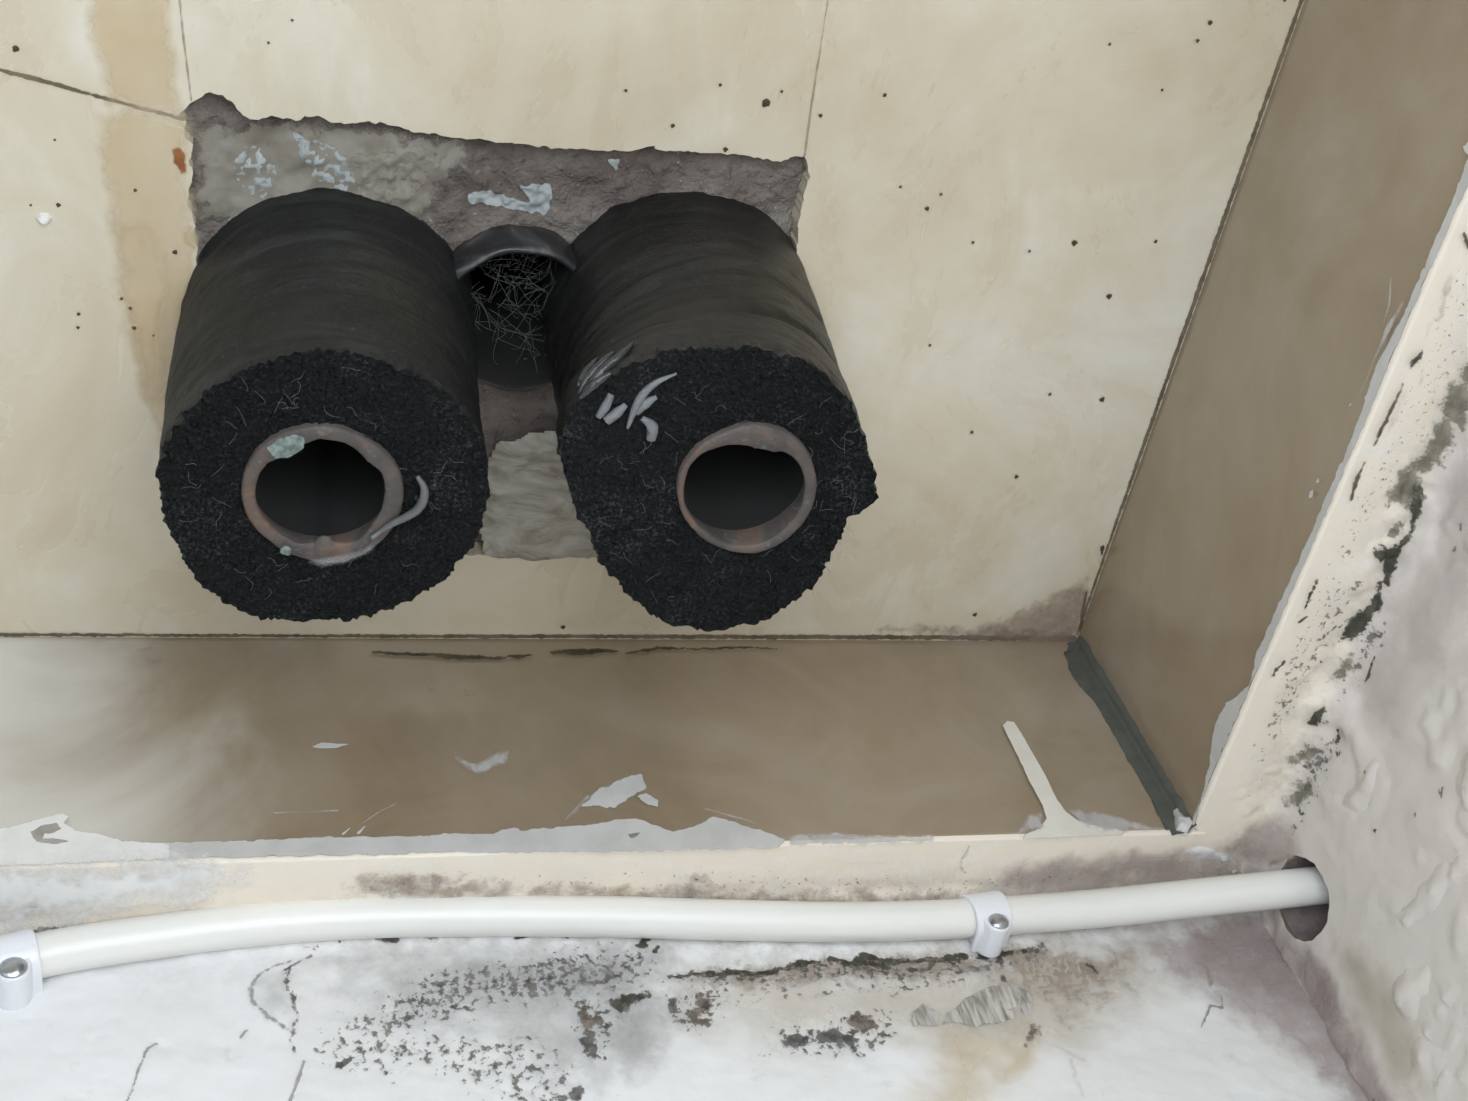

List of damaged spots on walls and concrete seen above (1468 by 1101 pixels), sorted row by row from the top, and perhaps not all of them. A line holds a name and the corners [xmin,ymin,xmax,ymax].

rust [173,148,186,173]
leakage [1253,280,1468,761]
leakage [1245,707,1341,864]
peeling [0,813,170,866]
leakage [371,871,505,897]
leakage [570,860,944,902]
leakage [963,857,1231,890]
leakage [314,937,1126,1101]